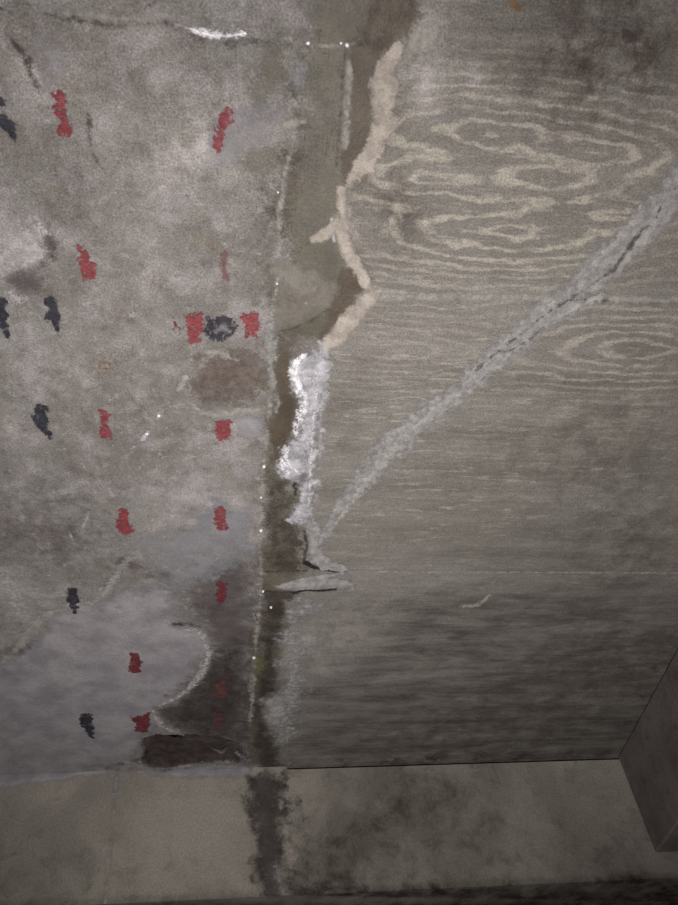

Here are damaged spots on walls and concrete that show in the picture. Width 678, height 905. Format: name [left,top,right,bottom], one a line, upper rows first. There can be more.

crack [56,10,181,26]
crack [312,44,353,149]
damp [136,0,441,896]
crack [248,131,678,722]
flaking render [0,585,252,789]